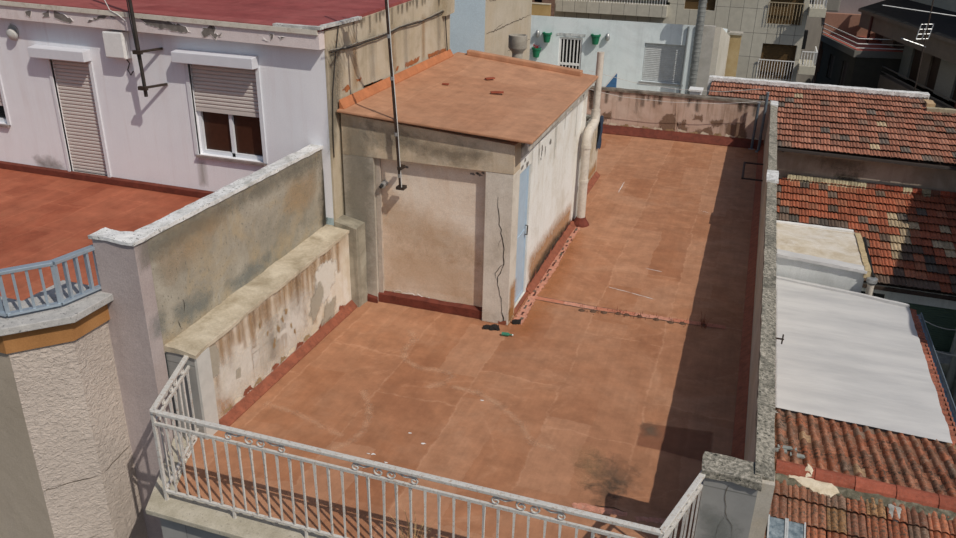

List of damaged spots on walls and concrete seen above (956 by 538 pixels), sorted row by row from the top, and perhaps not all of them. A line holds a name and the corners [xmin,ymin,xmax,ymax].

peeling [24,10,74,24]
peeling [139,18,189,34]
peeling [201,25,223,40]
peeling [603,99,759,140]
crack [495,209,504,321]
damp [530,210,570,282]
peeling [219,258,345,413]